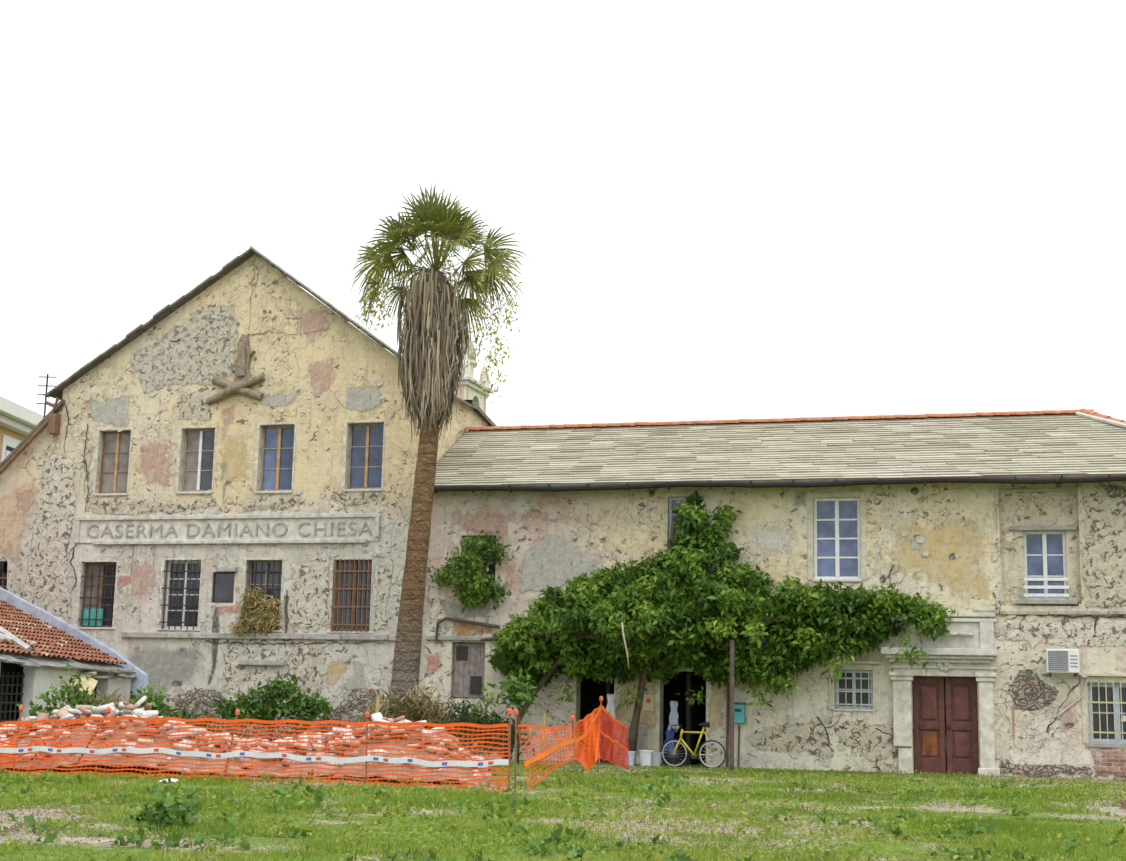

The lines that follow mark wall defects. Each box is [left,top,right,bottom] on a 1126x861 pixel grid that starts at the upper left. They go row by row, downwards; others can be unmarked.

flaking render [992,491,1126,652]
flaking render [740,713,909,770]
peeling [1052,702,1076,733]
flaking render [1092,748,1126,780]